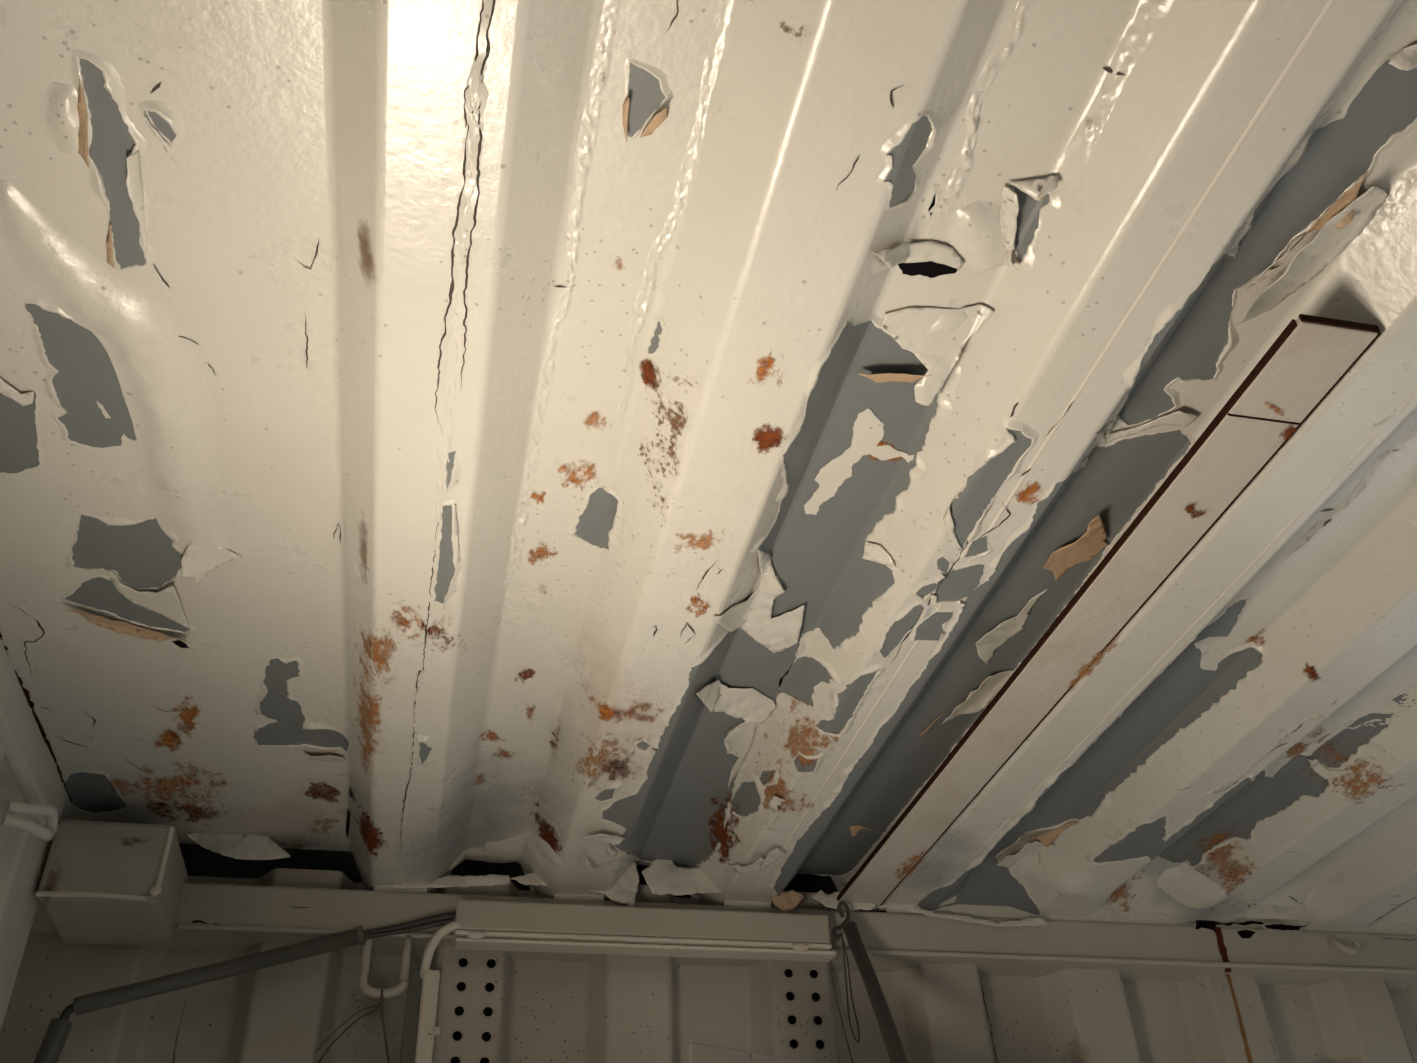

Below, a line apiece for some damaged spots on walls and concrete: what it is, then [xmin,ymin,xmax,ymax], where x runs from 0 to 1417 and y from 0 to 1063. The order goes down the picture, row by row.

peeling [71,49,185,271]
crack [435,0,496,433]
peeling [0,298,137,475]
rust [752,425,783,453]
peeling [593,0,1417,916]
crack [0,600,147,812]
peeling [61,512,242,650]
peeling [252,656,351,762]
rust [353,607,454,773]
crack [400,523,441,856]
rust [763,698,838,820]
rust [837,314,1381,911]